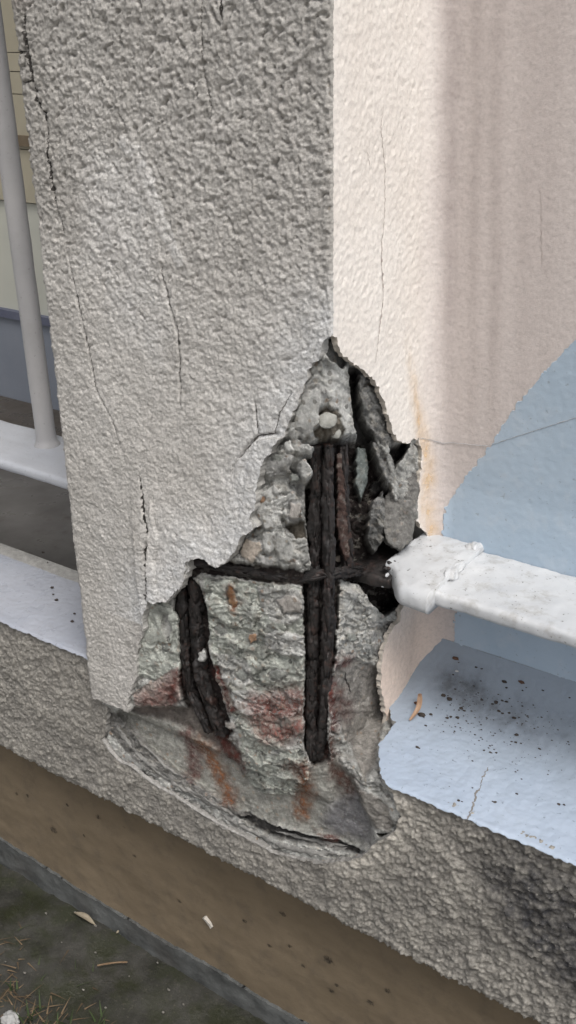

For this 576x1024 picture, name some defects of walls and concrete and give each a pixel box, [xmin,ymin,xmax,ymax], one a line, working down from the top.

crack [20,13,64,230]
crack [161,267,182,407]
crack [232,395,291,470]
crack [140,478,149,600]
spalling [102,337,420,861]
corrosion [181,727,244,805]
corrosion [249,693,306,742]
corrosion [317,679,355,794]